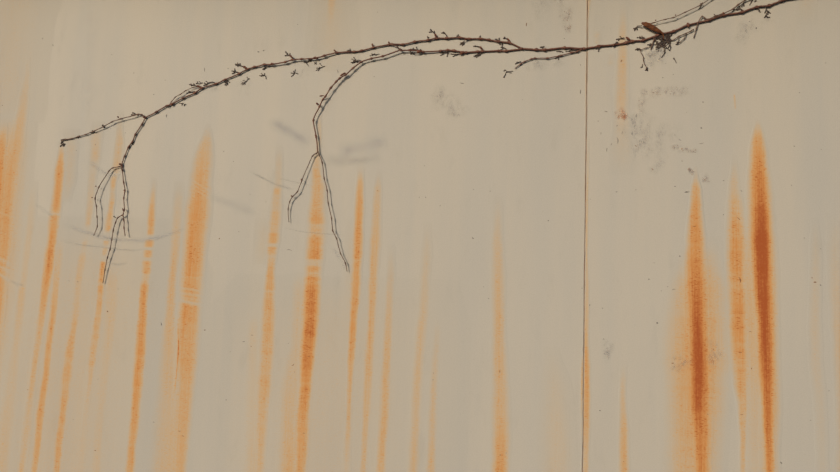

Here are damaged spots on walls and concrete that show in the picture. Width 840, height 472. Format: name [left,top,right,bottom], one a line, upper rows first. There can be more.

rust [0,0,472,472]
rust [656,120,784,472]